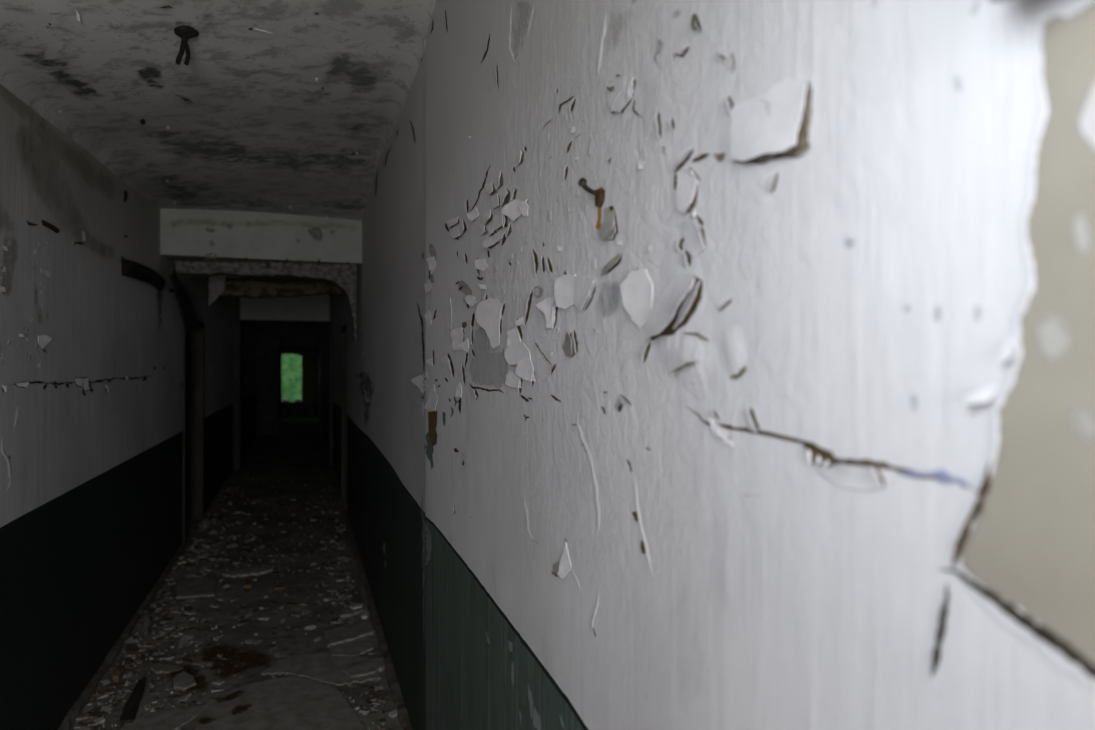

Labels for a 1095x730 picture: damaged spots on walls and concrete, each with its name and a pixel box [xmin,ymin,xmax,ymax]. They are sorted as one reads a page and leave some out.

damp [22,54,98,96]
damp [137,68,163,88]
peeling [606,75,675,139]
rust [595,187,605,229]
peeling [620,79,813,363]
peeling [411,146,623,470]
peeling [956,1,1095,665]
crack [1,365,183,397]
peeling [601,391,632,414]
peeling [551,539,580,590]
peeling [627,460,654,578]
crack [686,406,1095,691]